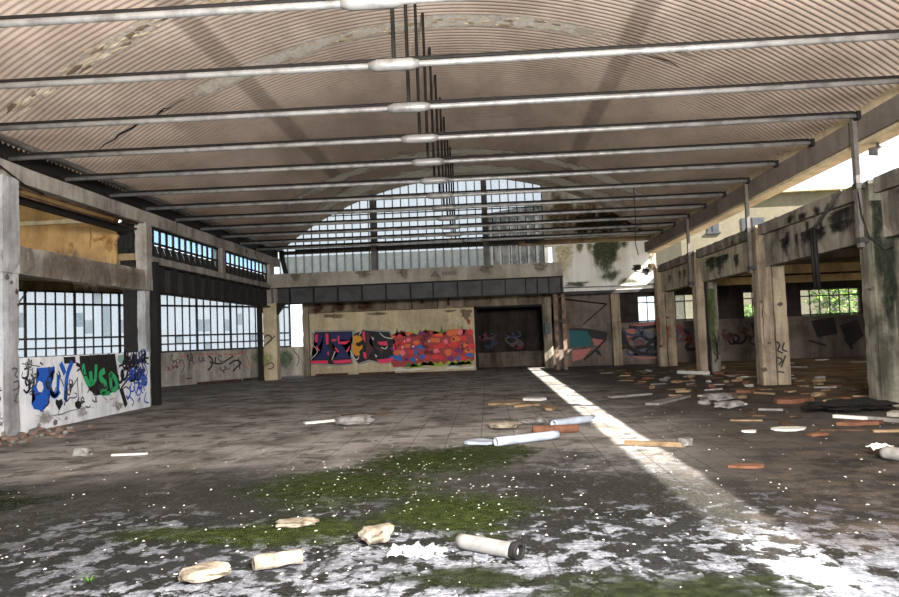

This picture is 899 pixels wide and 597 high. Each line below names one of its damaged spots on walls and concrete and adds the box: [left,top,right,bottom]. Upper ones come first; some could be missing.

peeling [56,18,168,75]
peeling [376,18,571,34]
peeling [2,86,61,117]
crack [100,99,184,149]
damp [289,148,658,269]
damp [780,207,852,249]
damp [705,254,739,274]
damp [870,200,896,341]